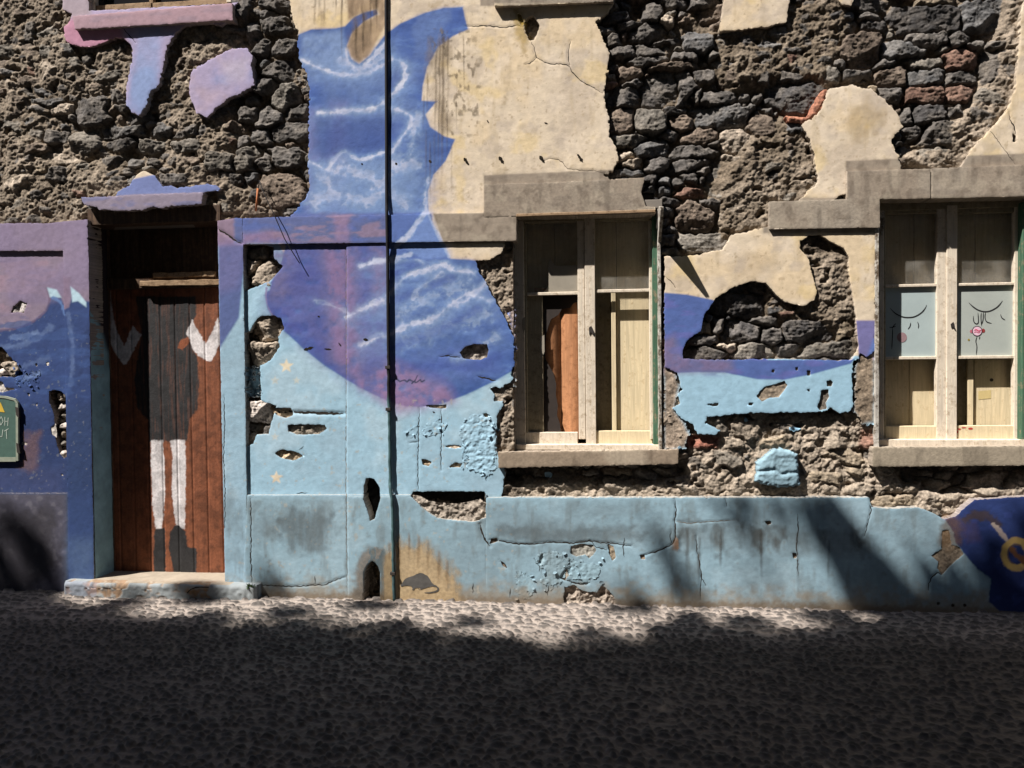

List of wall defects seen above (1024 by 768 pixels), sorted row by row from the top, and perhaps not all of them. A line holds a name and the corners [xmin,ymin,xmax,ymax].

crack [473,25,602,93]
spalling [0,0,310,224]
spalling [247,246,283,290]
spalling [403,0,1024,521]
spalling [0,347,49,406]
spalling [243,316,327,445]
spalling [50,390,67,458]
crack [480,499,734,600]
spalling [931,530,963,574]